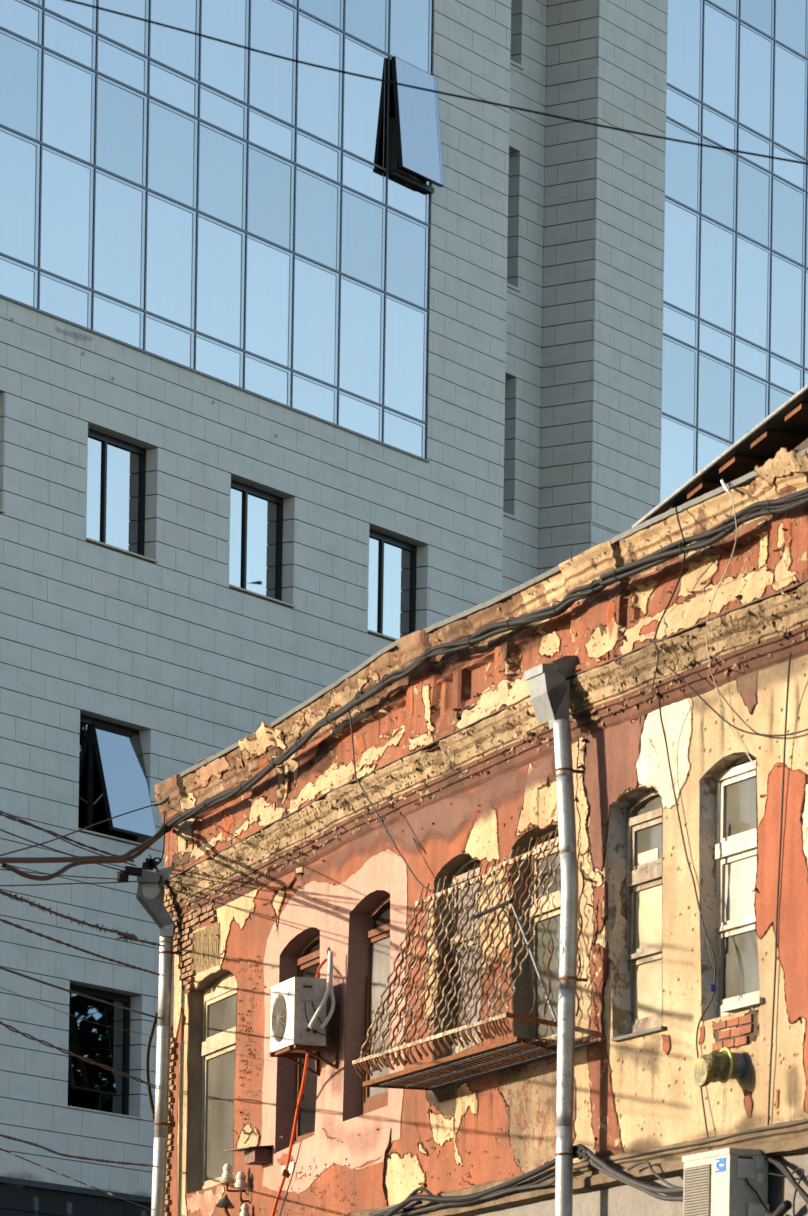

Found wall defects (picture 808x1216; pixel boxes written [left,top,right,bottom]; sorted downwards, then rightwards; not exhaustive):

peeling [155,514,808,1216]